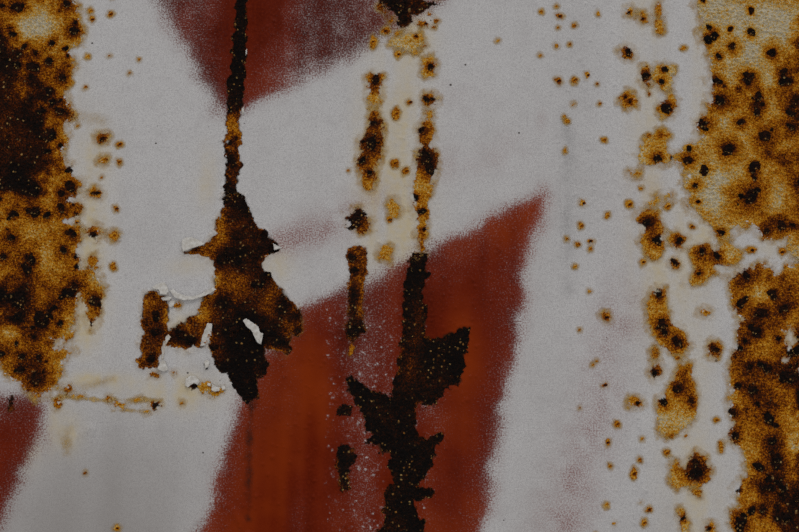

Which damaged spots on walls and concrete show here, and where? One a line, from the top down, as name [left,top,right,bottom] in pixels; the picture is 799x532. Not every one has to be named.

corrosion [0,0,125,409]
peeling [135,194,303,404]
corrosion [335,72,471,532]
corrosion [369,0,440,80]
corrosion [554,72,599,86]
corrosion [617,0,799,532]